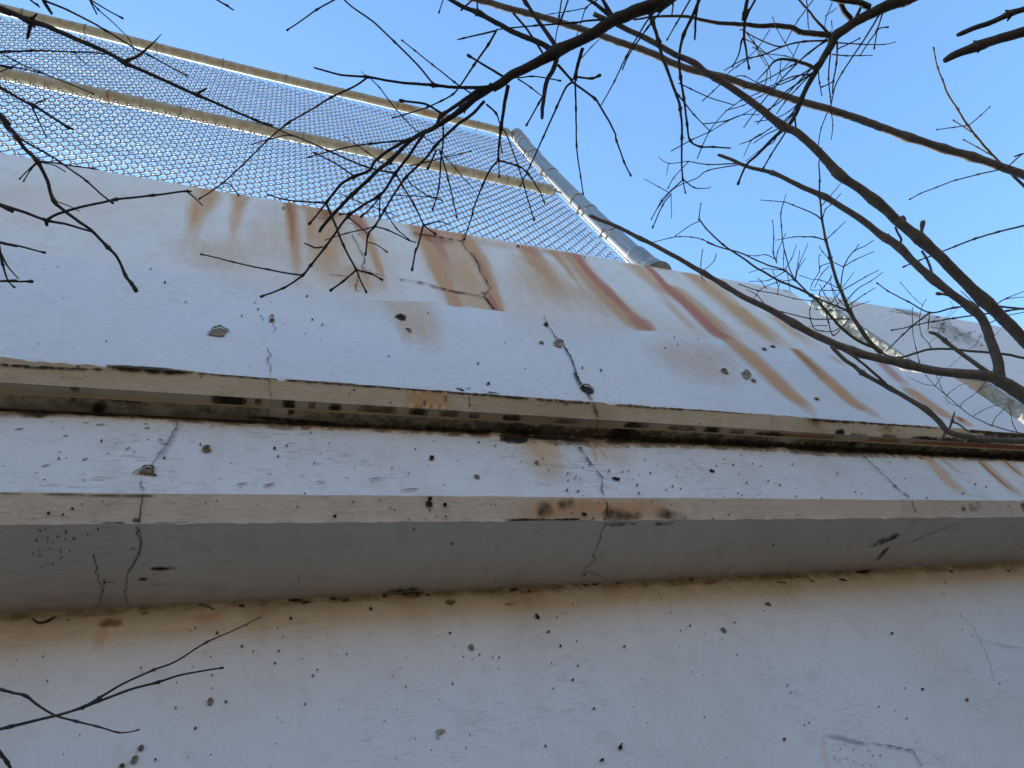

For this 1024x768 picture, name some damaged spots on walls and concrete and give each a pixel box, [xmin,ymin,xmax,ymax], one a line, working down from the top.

corrosion [190,187,217,226]
corrosion [232,194,243,227]
corrosion [286,203,383,285]
crack [401,232,494,309]
corrosion [410,224,503,311]
corrosion [519,245,653,330]
corrosion [629,264,807,406]
corrosion [791,348,862,409]
leakage [0,387,1024,465]
crack [544,318,609,579]
crack [93,417,183,607]